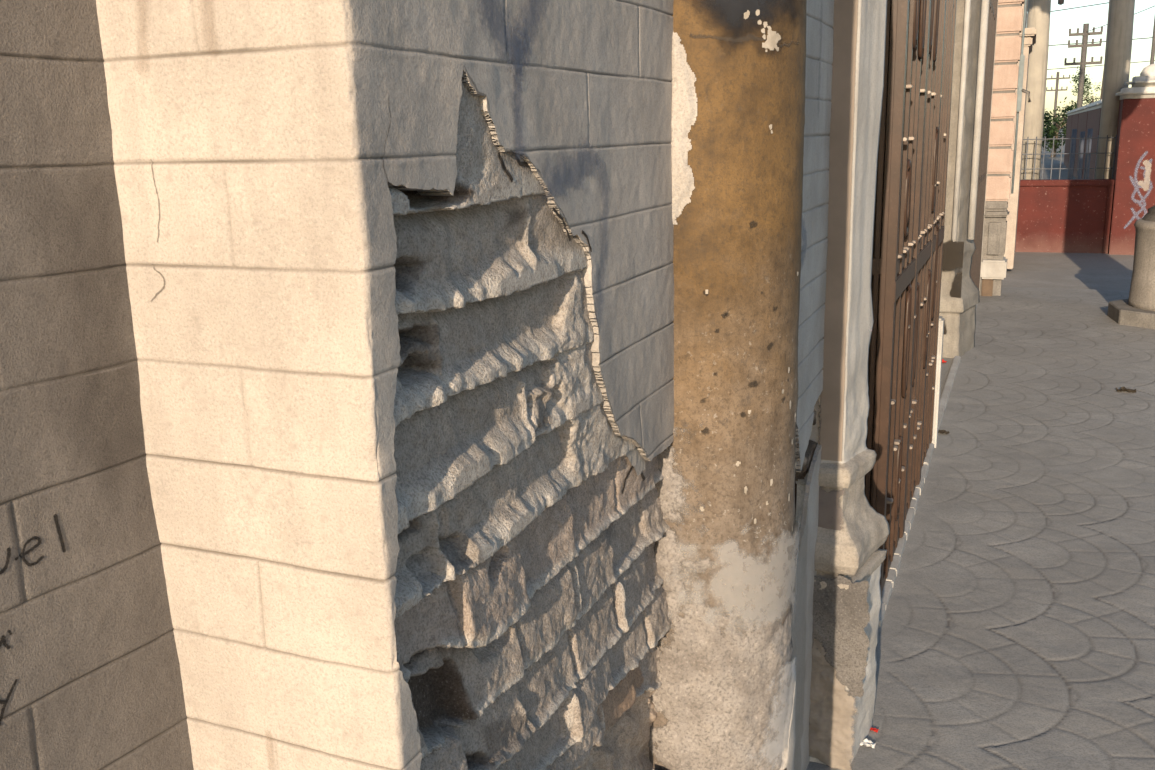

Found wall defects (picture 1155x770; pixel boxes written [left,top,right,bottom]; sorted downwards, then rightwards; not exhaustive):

spalling [387,70,672,770]
spalling [809,639,857,770]